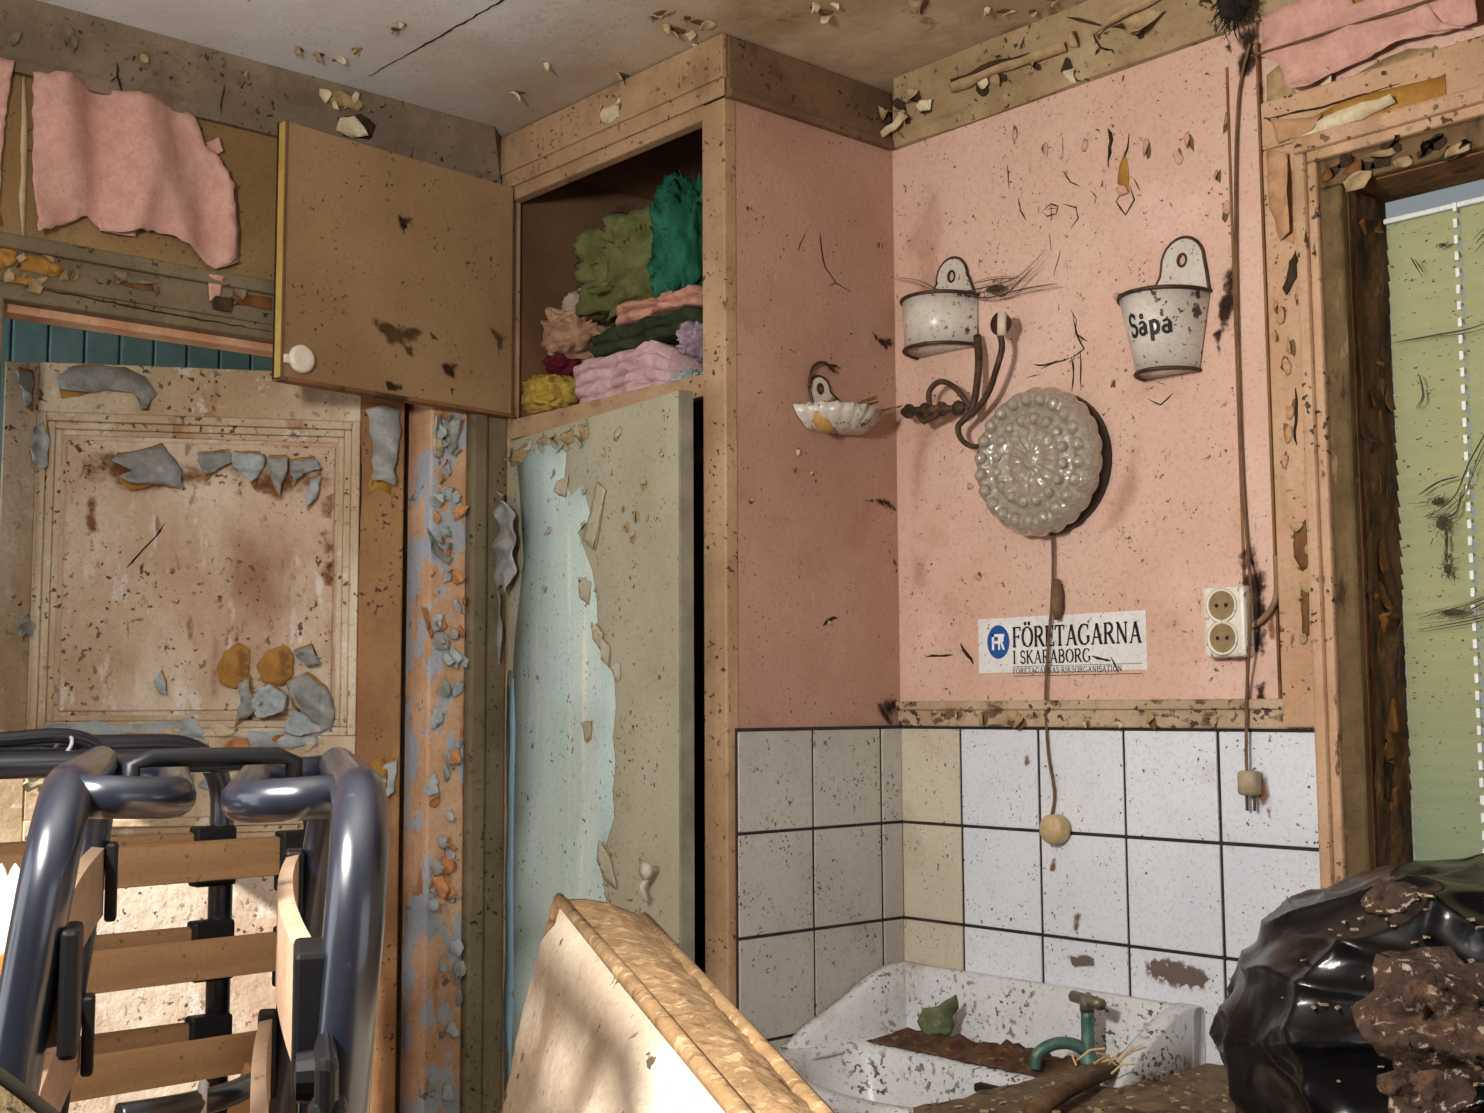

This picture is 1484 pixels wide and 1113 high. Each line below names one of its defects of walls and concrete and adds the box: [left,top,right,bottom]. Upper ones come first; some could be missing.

peeling [646,10,717,47]
peeling [810,3,840,24]
peeling [0,247,80,294]
peeling [208,257,274,312]
peeling [56,364,157,411]
peeling [111,443,321,512]
peeling [420,413,469,730]
peeling [37,642,334,756]
peeling [22,778,45,792]
peeling [491,420,621,1105]
peeling [423,740,464,913]
peeling [439,939,467,1039]